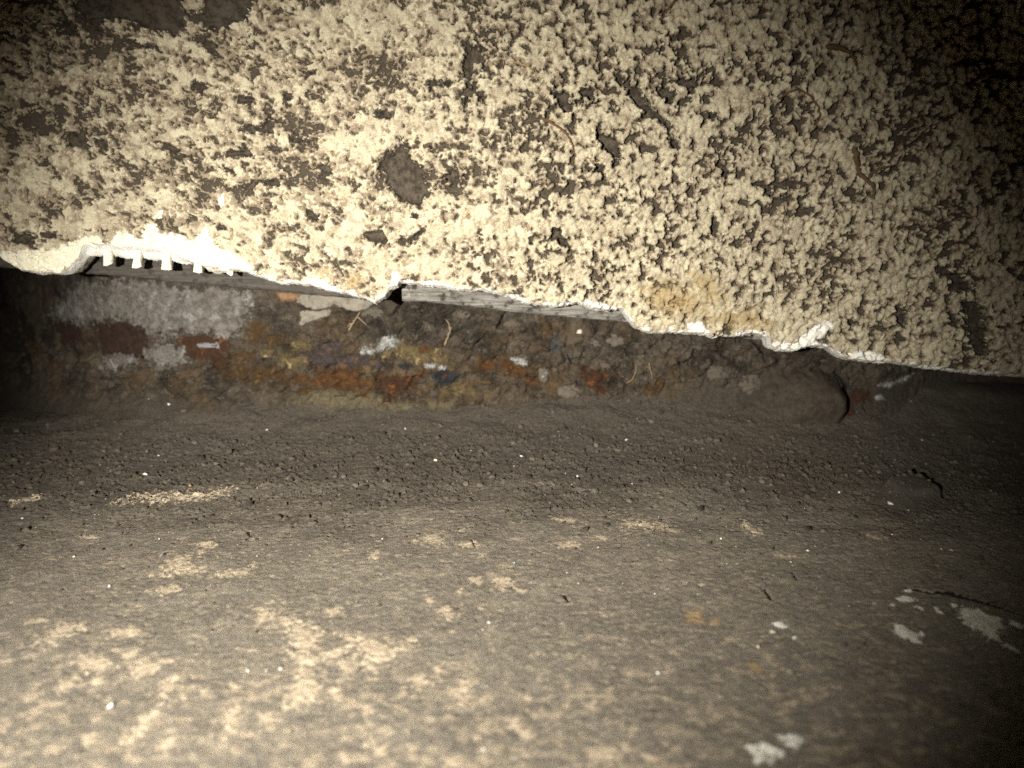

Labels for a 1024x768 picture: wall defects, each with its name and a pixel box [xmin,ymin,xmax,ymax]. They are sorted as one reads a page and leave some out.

spalling [319,164,333,179]
spalling [305,210,320,223]
spalling [0,210,277,281]
spalling [303,278,357,296]